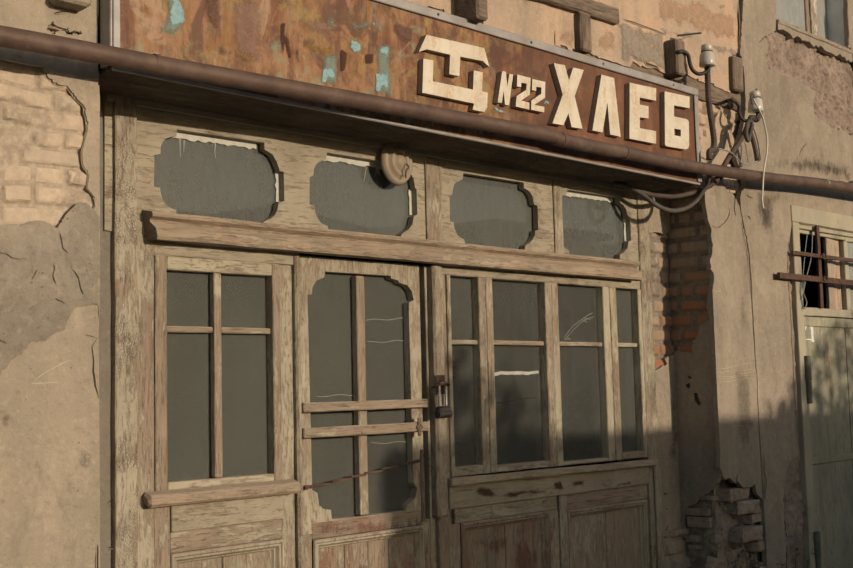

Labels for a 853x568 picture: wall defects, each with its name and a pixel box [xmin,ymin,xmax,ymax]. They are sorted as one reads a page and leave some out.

spalling [765,22,853,134]